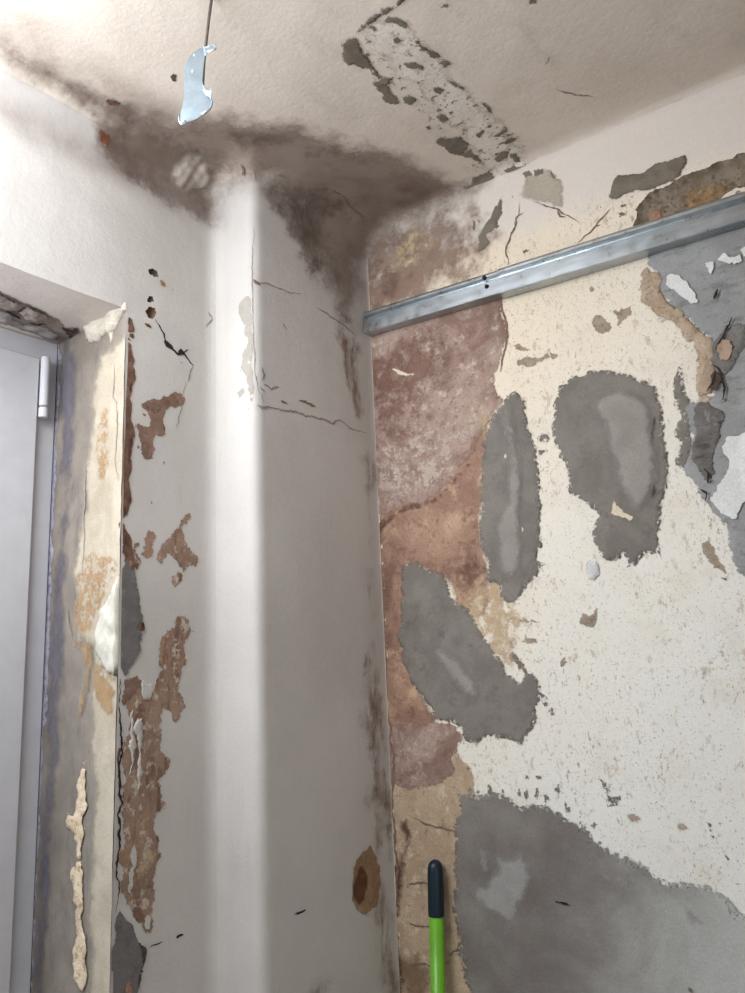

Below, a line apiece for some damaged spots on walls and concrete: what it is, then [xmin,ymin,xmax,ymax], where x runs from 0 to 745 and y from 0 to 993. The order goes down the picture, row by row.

water stain [10,51,497,310]
peeling [341,0,526,189]
crack [505,202,610,265]
flaking render [619,153,745,226]
crack [156,321,194,428]
crack [251,229,372,433]
peeling [371,300,558,516]
crack [500,299,509,371]
flaking render [592,267,716,403]
peeling [0,291,198,993]
spalling [702,538,728,580]
flaking render [391,753,504,993]